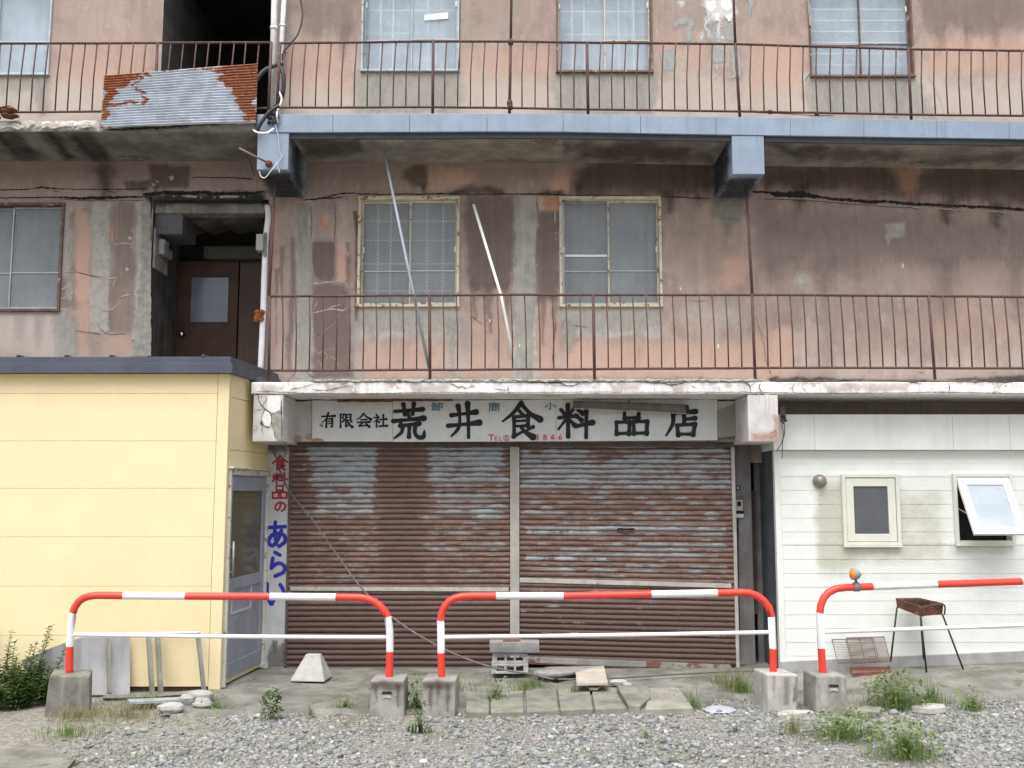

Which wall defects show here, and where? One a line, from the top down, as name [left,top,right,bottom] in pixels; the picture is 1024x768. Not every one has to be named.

peeling [699,0,737,46]
damp [140,167,264,205]
crack [751,191,1024,214]
damp [454,188,511,297]
crack [0,177,711,438]
crack [614,319,1024,394]
spalling [254,386,282,440]